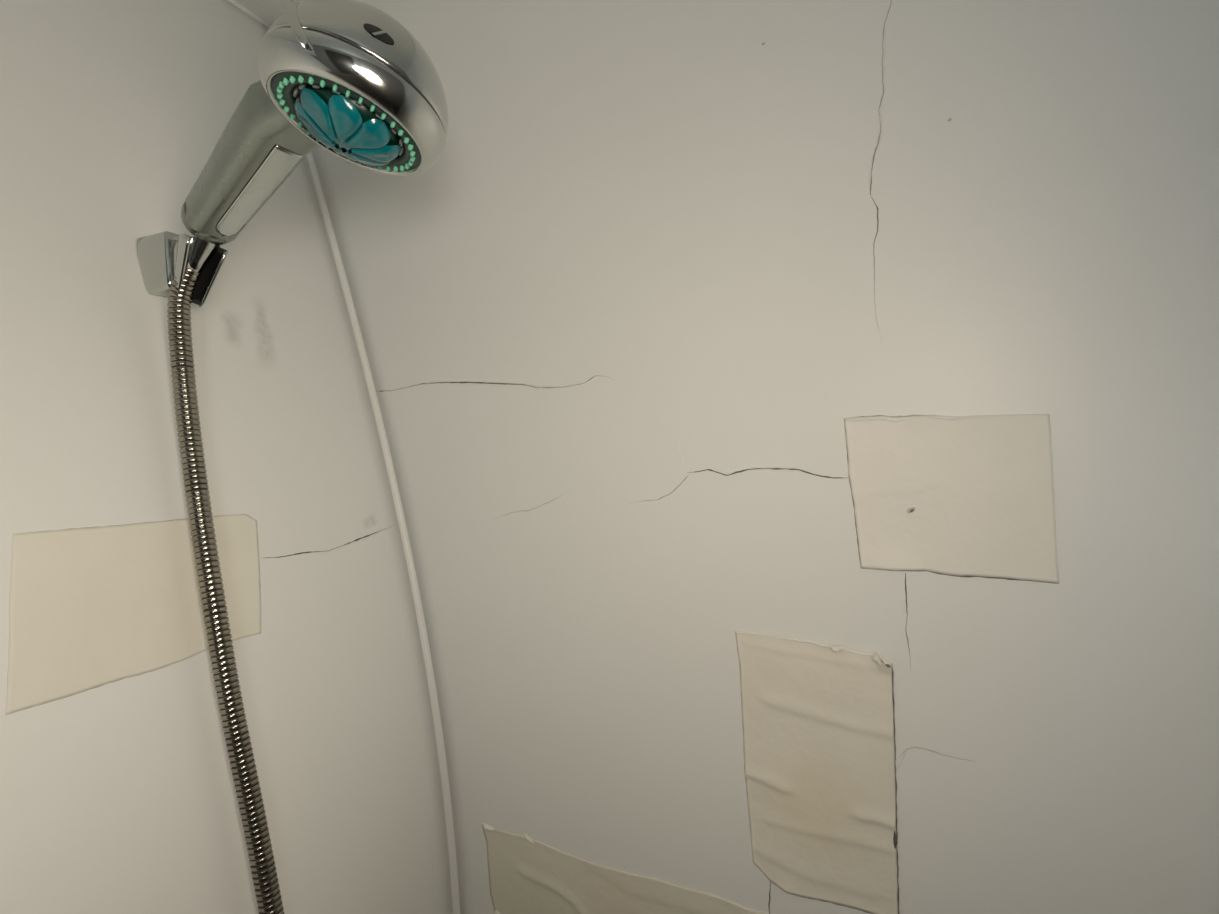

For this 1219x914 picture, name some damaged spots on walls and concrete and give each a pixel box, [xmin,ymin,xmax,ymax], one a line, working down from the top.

crack [868,4,891,340]
crack [381,375,612,392]
crack [630,436,841,504]
crack [267,526,392,558]